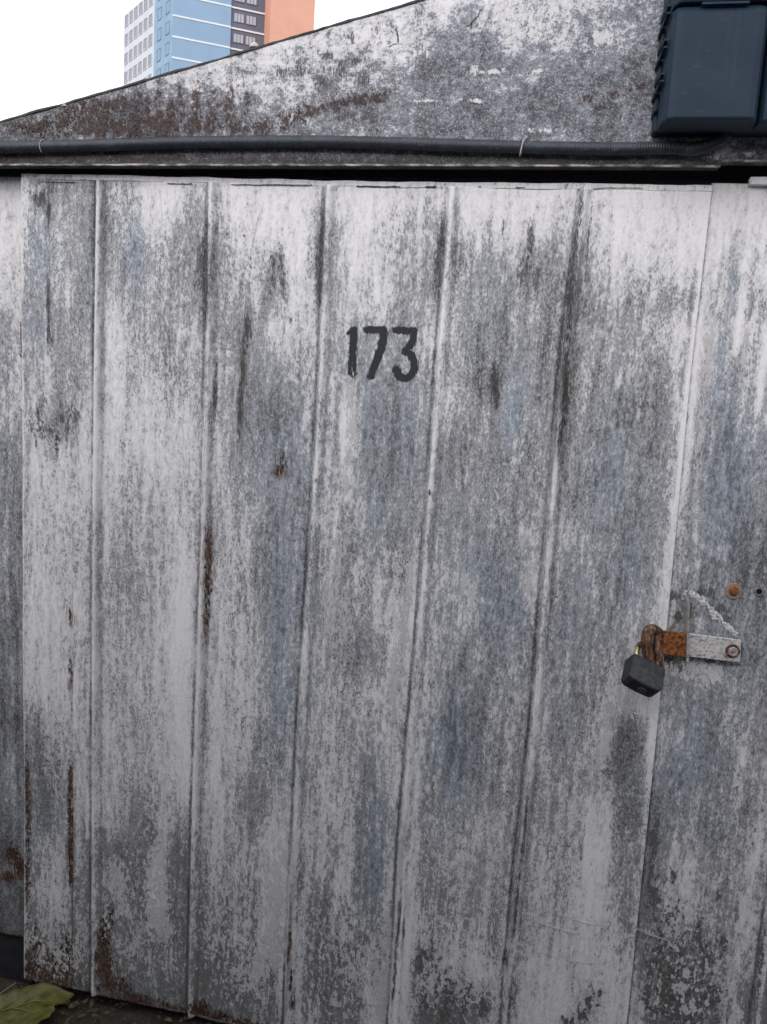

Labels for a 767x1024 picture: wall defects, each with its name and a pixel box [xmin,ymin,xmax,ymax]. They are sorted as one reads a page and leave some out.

water stain [515,217,541,307]
water stain [566,187,593,315]
rust [202,498,214,644]
rust [0,745,76,988]
rust [91,899,268,1024]